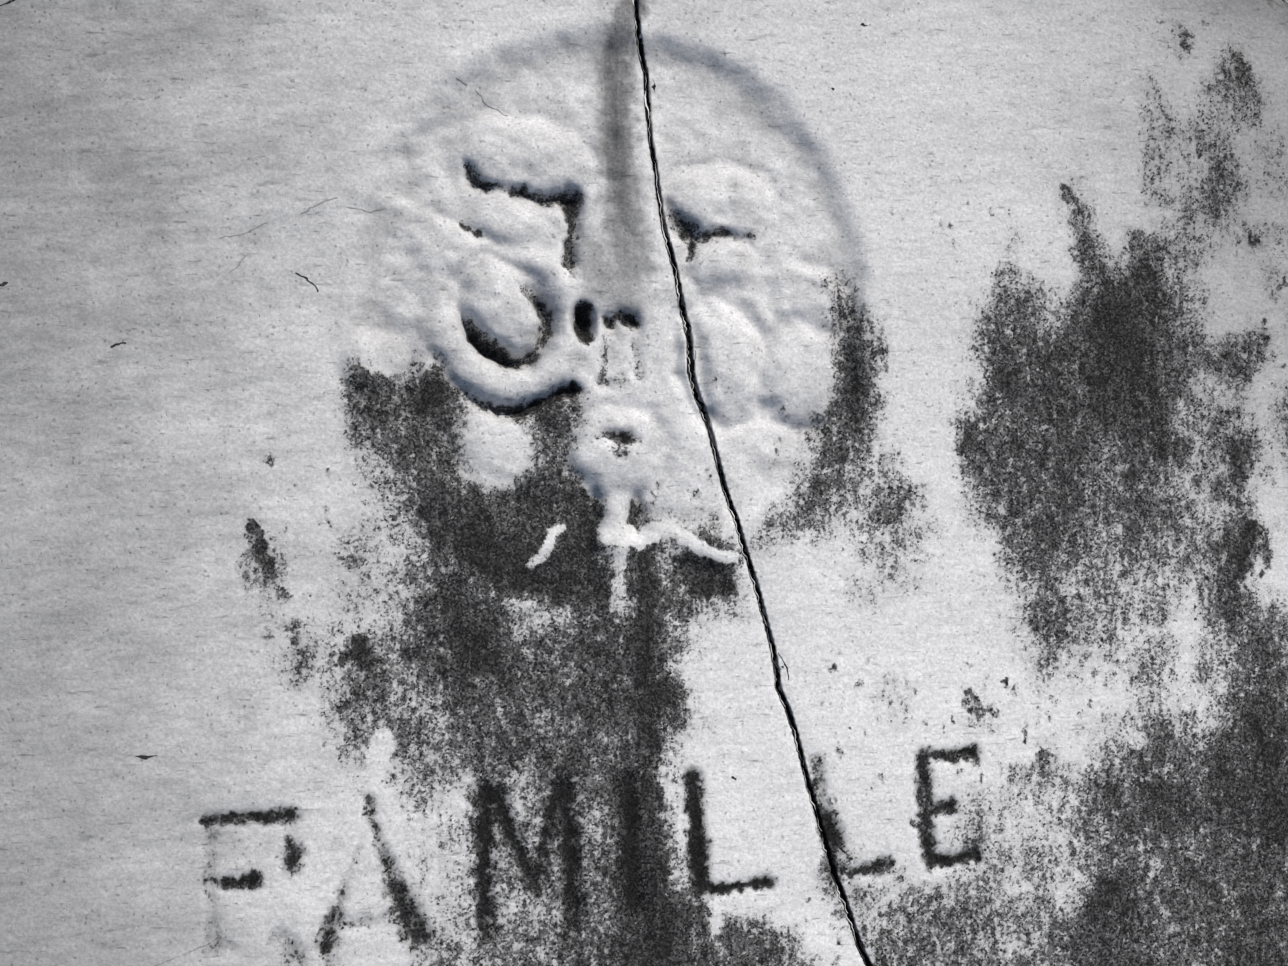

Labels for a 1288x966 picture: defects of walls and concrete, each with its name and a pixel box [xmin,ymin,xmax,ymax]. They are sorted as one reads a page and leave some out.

leakage [606,0,645,220]
crack [633,0,872,966]
leakage [236,44,1288,966]
leakage [1157,20,1209,59]